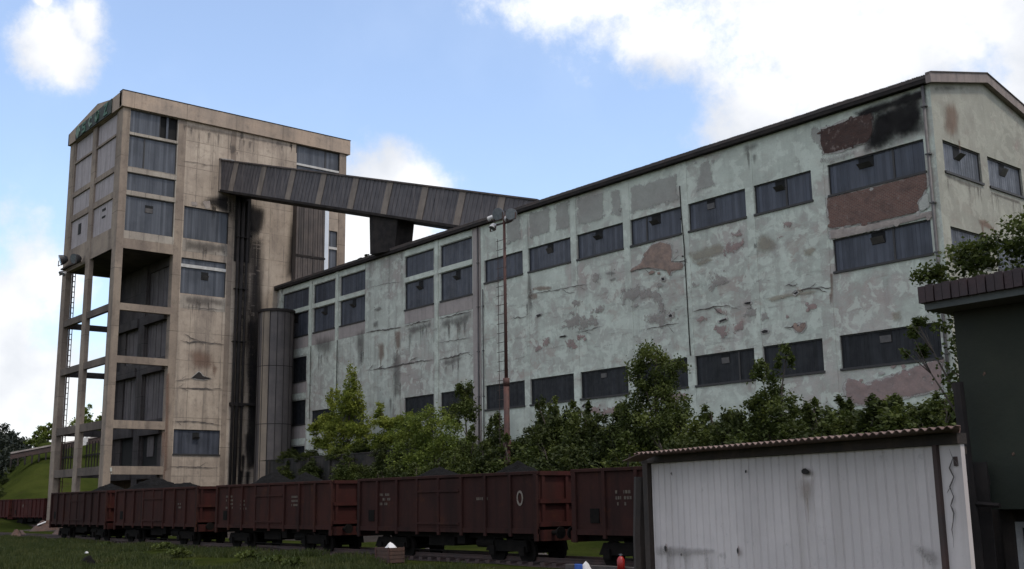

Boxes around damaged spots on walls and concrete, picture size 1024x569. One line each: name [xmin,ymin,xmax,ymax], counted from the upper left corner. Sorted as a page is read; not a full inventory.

flaking render [811,113,874,163]
water stain [857,91,922,147]
water stain [250,207,263,248]
flaking render [825,173,932,238]
flaking render [620,240,684,329]
crack [786,280,831,292]
peeling [535,300,604,352]
crack [649,305,740,333]
flaking render [842,359,945,407]
crack [947,449,958,548]